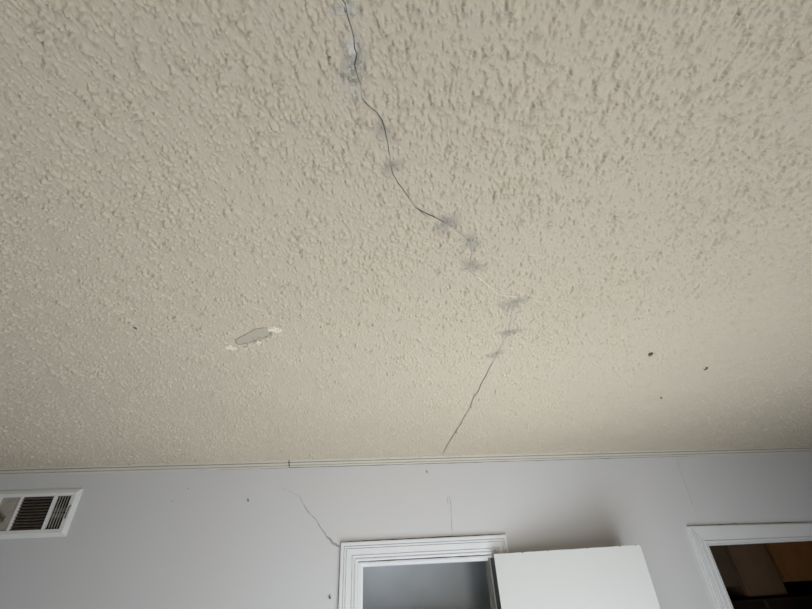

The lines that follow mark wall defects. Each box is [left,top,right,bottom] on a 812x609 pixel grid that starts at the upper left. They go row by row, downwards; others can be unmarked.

crack [334,0,517,451]
crack [282,488,340,548]